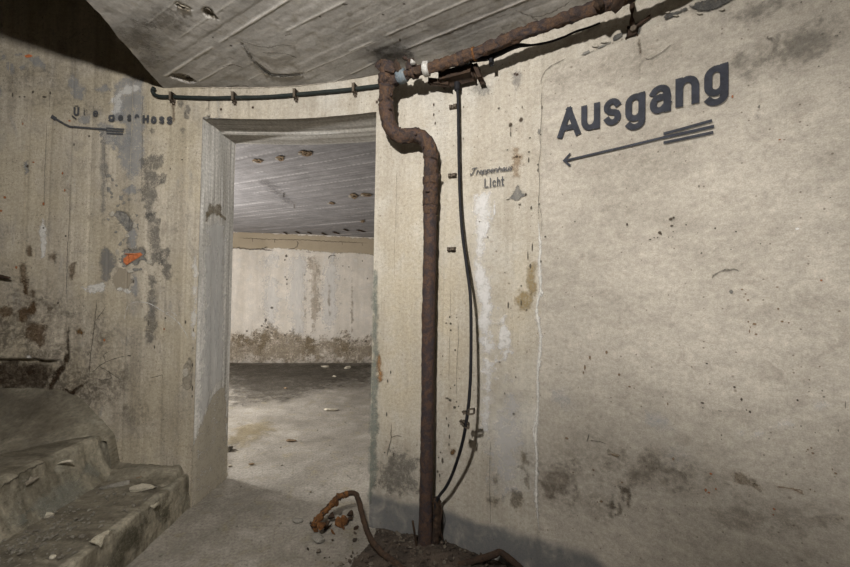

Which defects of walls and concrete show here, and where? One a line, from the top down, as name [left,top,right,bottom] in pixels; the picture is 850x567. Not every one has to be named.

peeling [98,78,152,295]
leakage [189,204,419,506]
leakage [474,193,513,431]
crack [533,59,564,527]
rust [311,490,349,528]